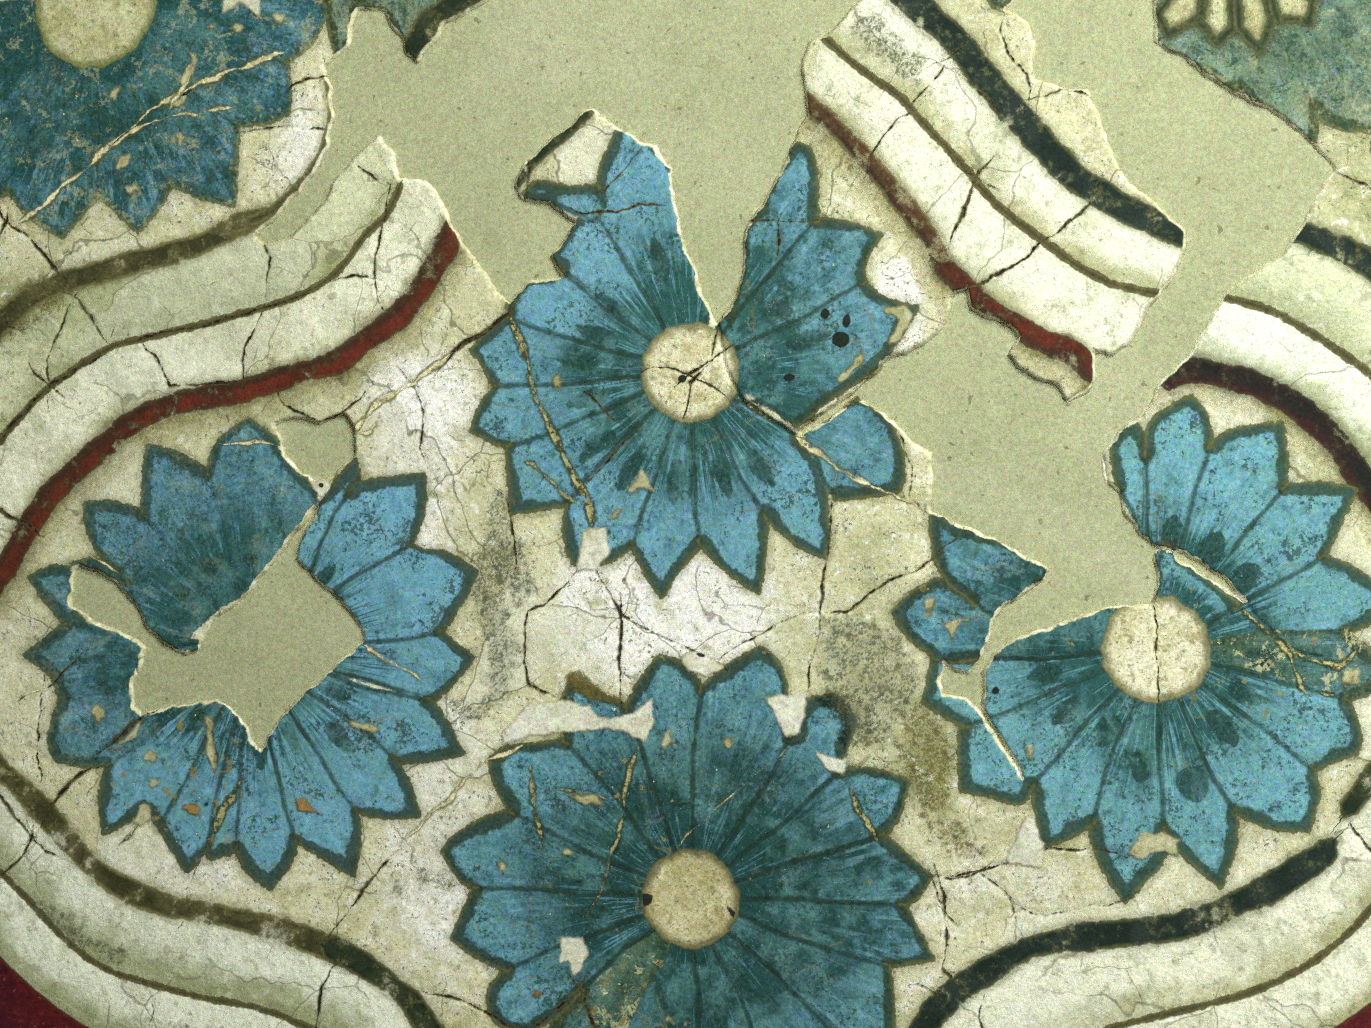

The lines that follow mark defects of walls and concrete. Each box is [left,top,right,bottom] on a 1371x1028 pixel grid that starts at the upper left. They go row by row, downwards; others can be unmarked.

spalling [73,511,363,769]
spalling [277,416,355,487]
crack [0,51,643,528]
crack [315,745,637,1028]
spalling [257,0,859,322]
crack [570,149,665,233]
peeling [628,470,654,493]
crack [523,316,964,714]
leakage [817,615,985,854]
spalling [804,0,1334,745]
crack [1153,594,1162,710]
crack [1335,802,1371,851]